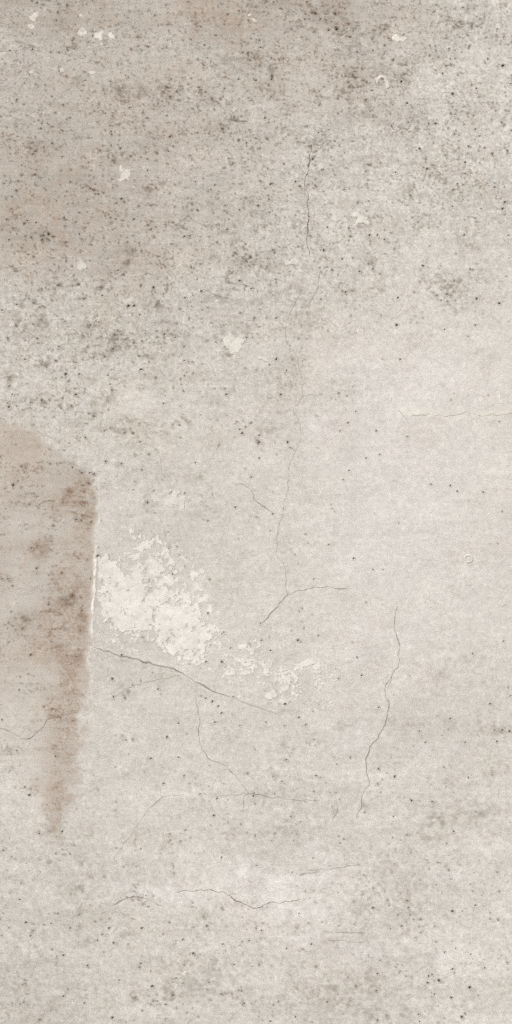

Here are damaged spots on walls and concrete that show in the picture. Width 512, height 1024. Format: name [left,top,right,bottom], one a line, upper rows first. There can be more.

crack [235,144,347,625]
leakage [0,417,101,844]
peeling [90,529,341,712]
crack [91,607,400,819]
crack [100,864,358,909]